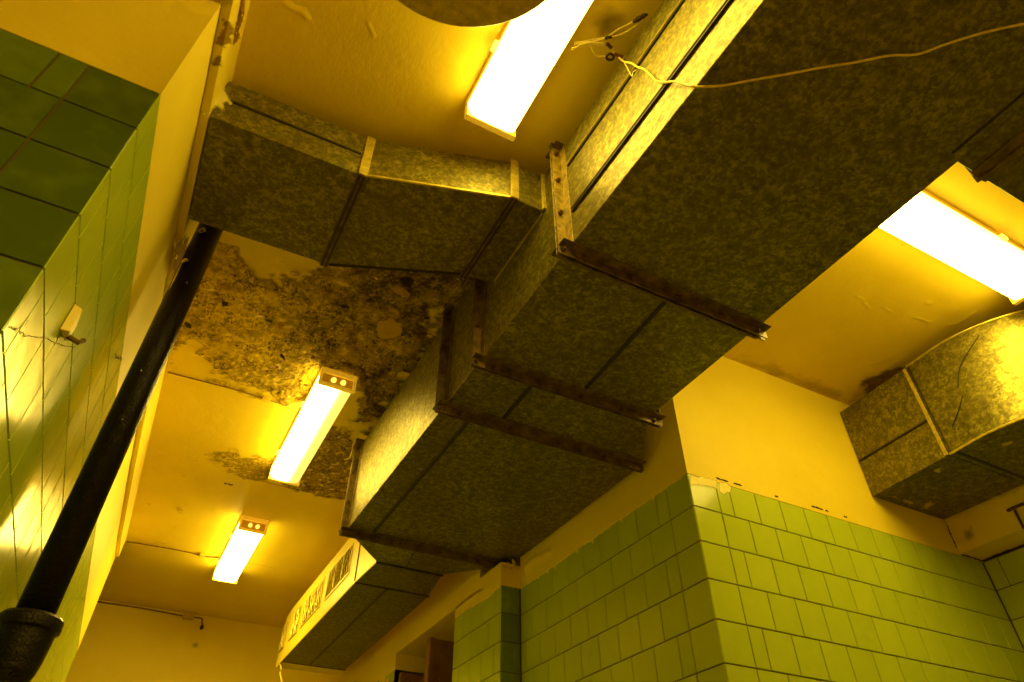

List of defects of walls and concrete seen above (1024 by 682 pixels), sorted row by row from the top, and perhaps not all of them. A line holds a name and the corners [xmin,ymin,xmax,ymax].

crack [8,321,74,348]
peeling [169,227,475,500]
damp [861,367,905,394]